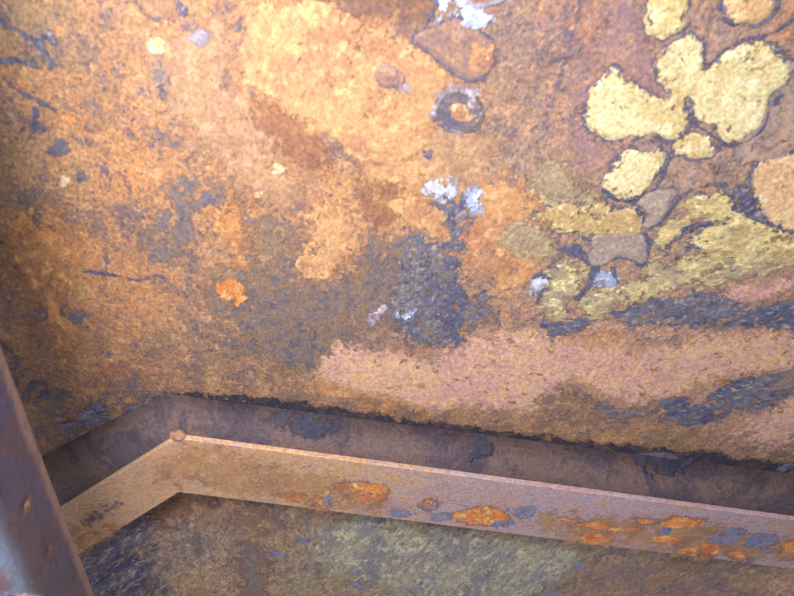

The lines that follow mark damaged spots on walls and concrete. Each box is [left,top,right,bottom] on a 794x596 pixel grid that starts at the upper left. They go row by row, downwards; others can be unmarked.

rust [314,0,434,32]
rust [0,196,102,365]
peeling [58,170,89,187]
rust [109,0,334,306]
rust [342,73,549,294]
peeling [131,0,794,452]
rust [150,441,390,596]
rust [447,505,794,564]